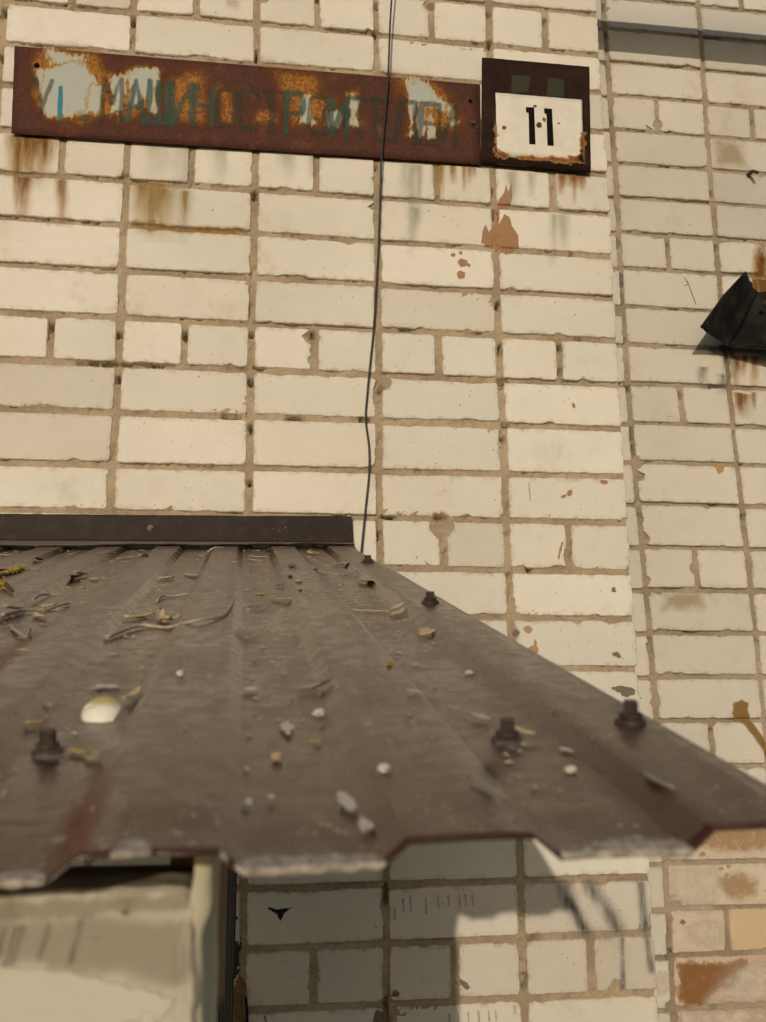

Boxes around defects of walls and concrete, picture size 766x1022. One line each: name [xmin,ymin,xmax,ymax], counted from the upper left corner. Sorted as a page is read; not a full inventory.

corrosion [11,135,48,202]
corrosion [57,179,65,206]
corrosion [132,182,247,234]